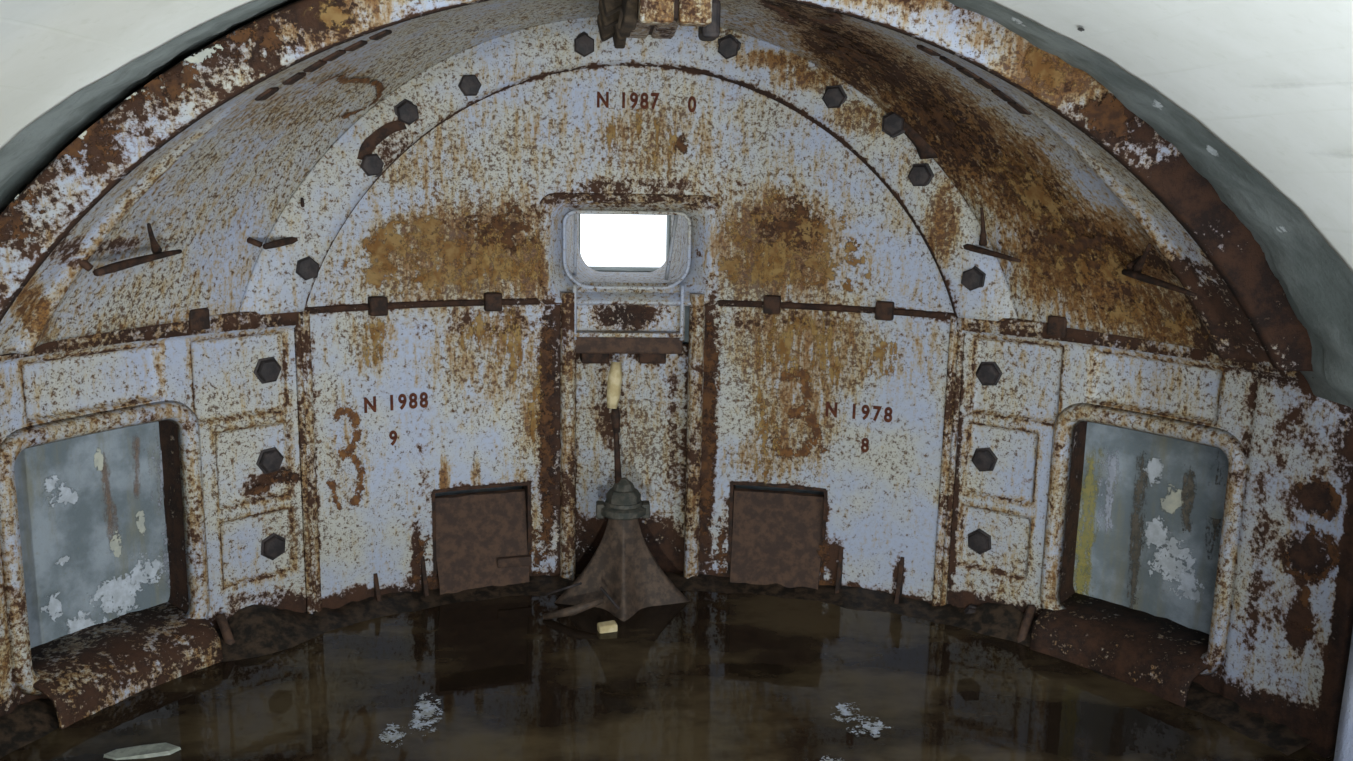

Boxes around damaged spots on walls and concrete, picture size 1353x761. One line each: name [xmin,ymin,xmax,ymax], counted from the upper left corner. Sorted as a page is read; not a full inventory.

rust [210,21,297,64]
rust [310,0,354,31]
rust [128,61,206,107]
rust [55,118,123,172]
rust [0,185,47,248]
rust [718,188,880,294]
rust [342,202,555,574]
rust [747,310,899,484]
rust [699,311,728,576]
rust [406,522,438,592]